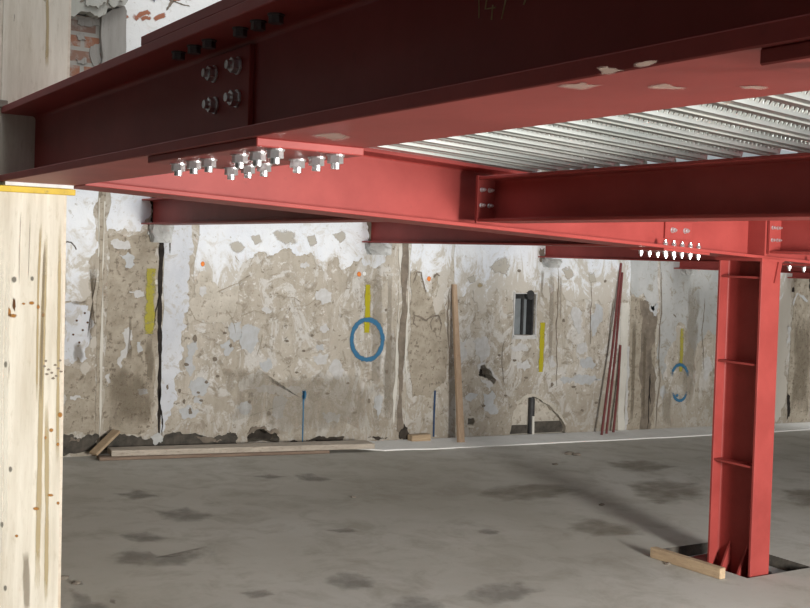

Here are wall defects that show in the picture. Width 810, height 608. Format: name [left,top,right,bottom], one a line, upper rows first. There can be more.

flaking render [70,0,128,77]
flaking render [126,10,165,21]
crack [154,243,164,433]
spalling [45,189,386,456]
peeling [368,244,718,440]